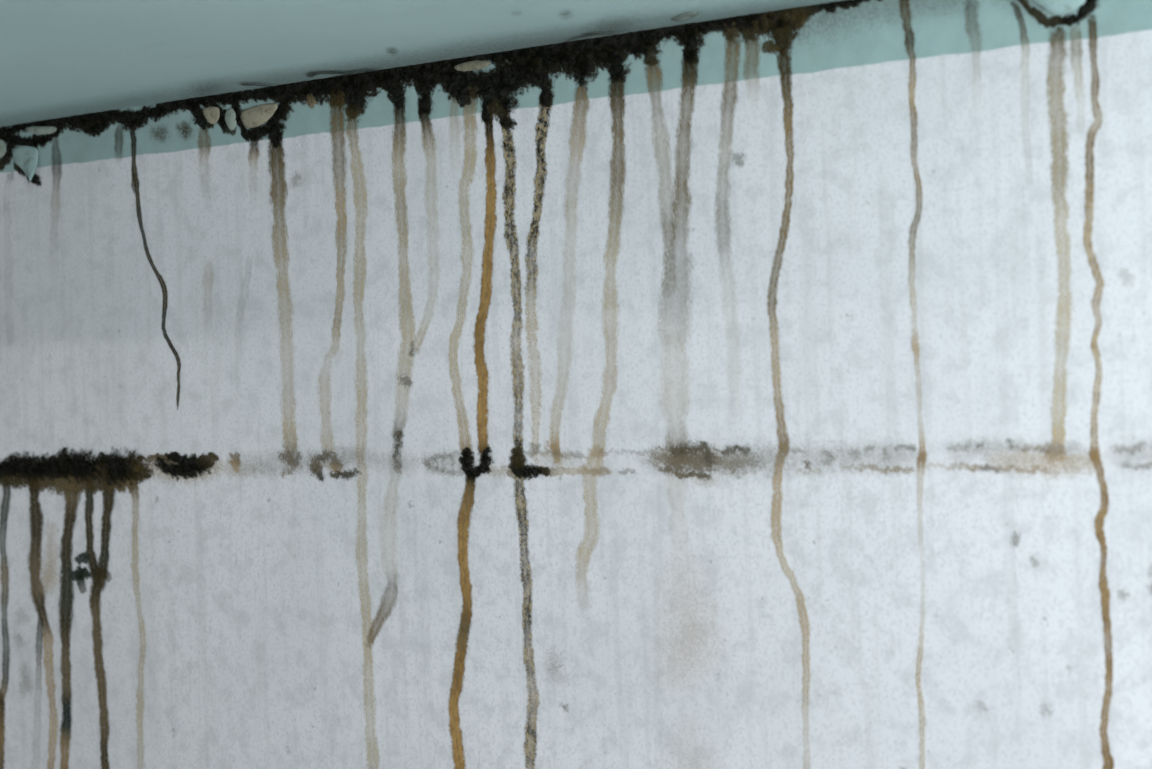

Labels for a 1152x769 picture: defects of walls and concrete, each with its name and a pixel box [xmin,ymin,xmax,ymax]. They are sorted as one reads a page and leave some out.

damp [249,141,289,297]
crack [0,0,882,408]
corrosion [474,114,497,457]
damp [604,79,625,261]
damp [899,0,922,263]
crack [1018,0,1097,28]
corrosion [1083,15,1104,303]
damp [0,447,240,769]
corrosion [449,476,475,769]
damp [458,412,493,480]
damp [502,96,563,769]
corrosion [1089,319,1114,769]